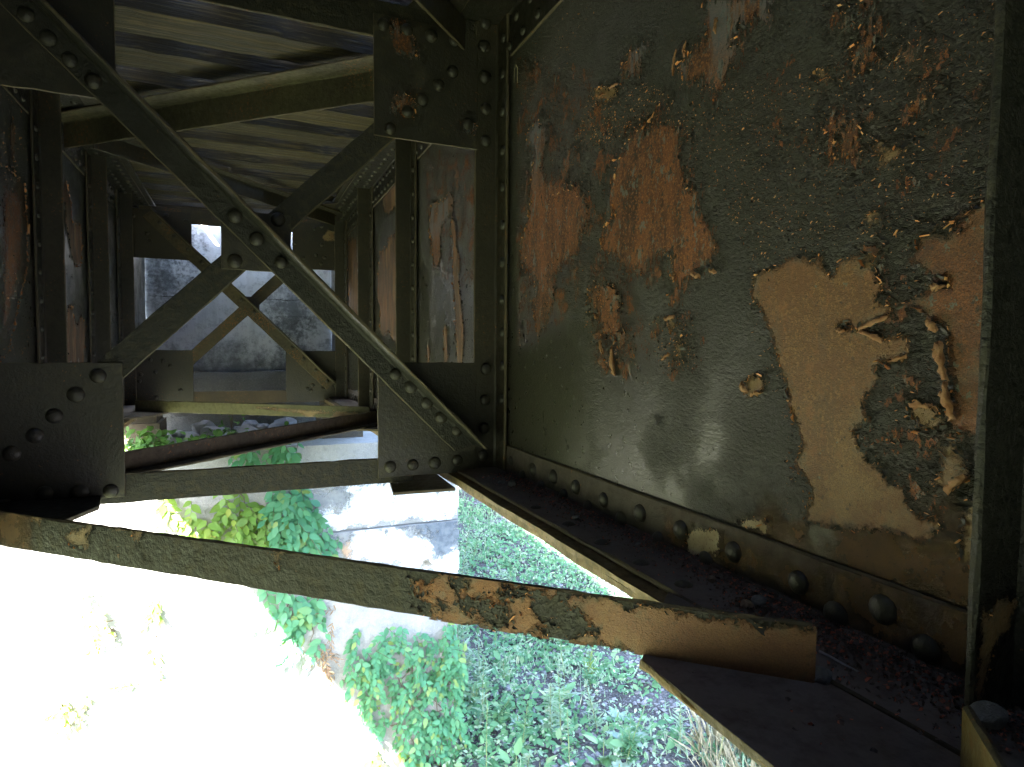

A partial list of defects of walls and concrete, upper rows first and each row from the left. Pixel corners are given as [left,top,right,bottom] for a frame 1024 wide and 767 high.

rust [0,164,30,362]
rust [443,215,465,363]
peeling [517,0,994,568]
peeling [405,574,590,640]